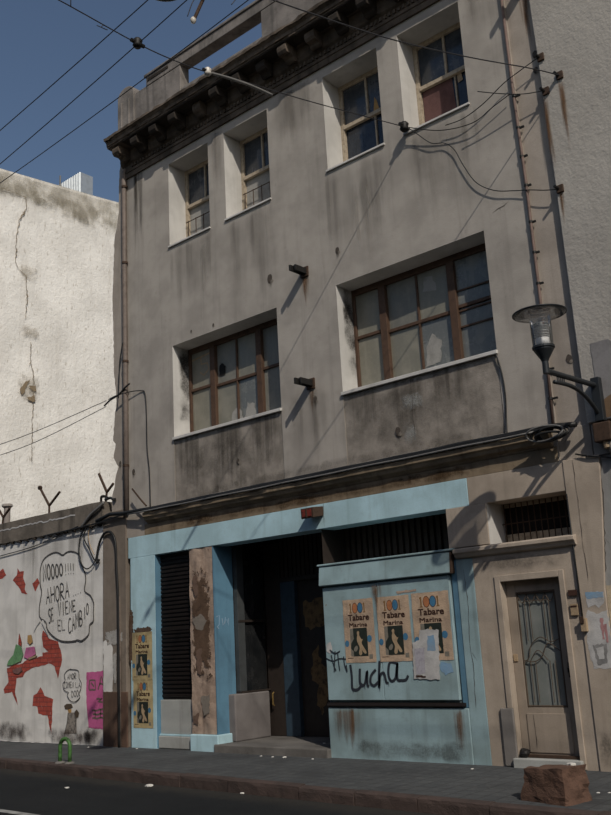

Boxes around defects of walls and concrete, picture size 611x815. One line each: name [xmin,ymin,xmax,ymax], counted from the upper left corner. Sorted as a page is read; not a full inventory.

water stain [0,170,119,225]
flaking render [20,379,36,402]
peeling [191,568,213,679]